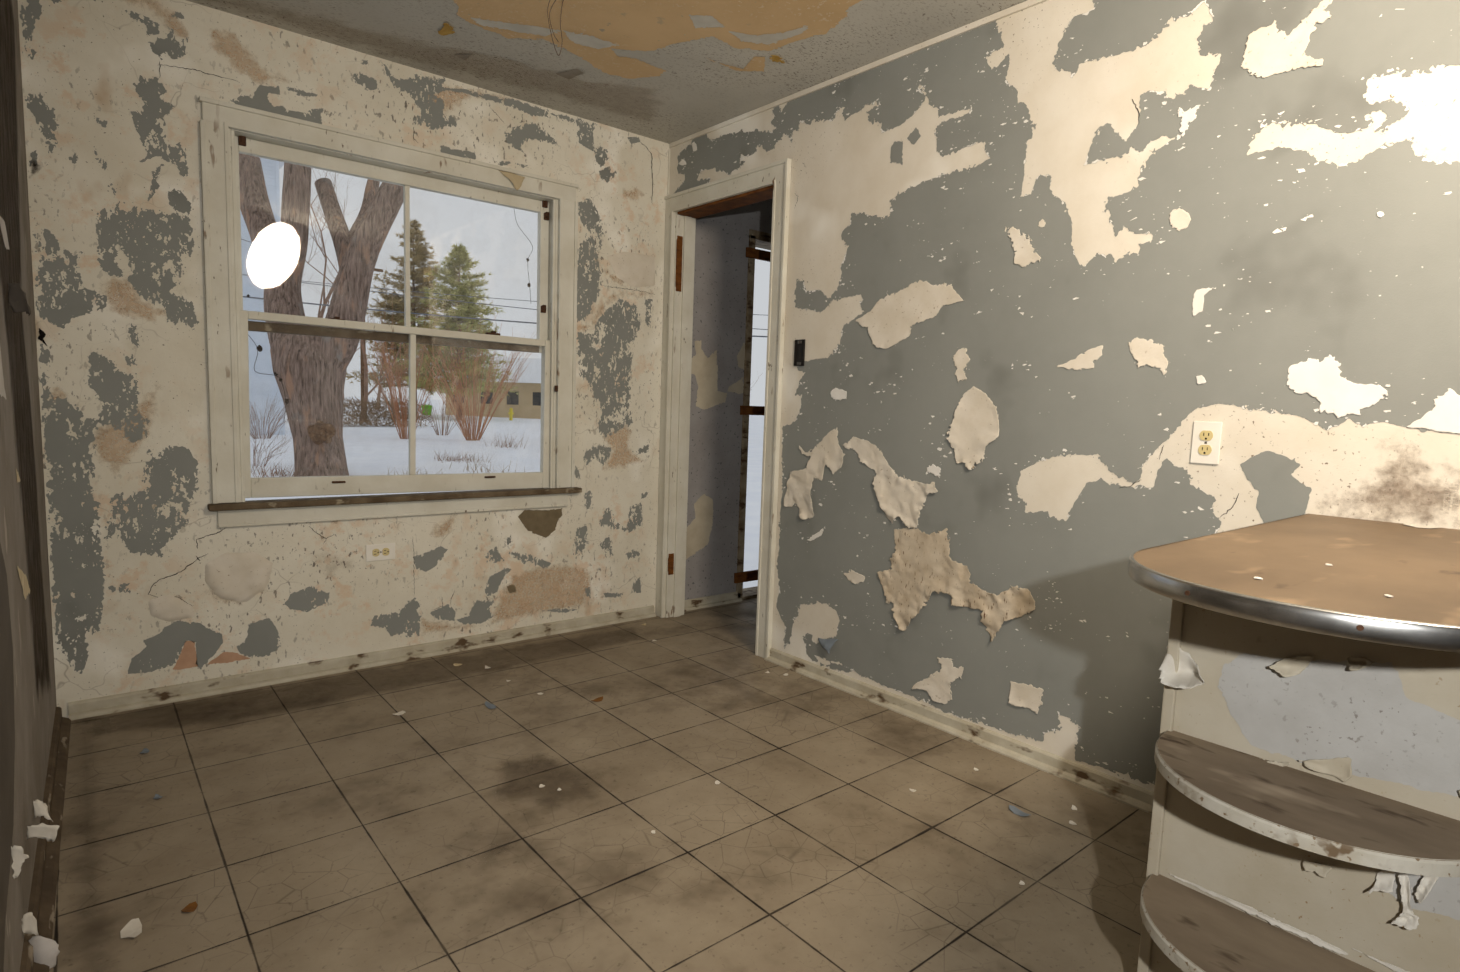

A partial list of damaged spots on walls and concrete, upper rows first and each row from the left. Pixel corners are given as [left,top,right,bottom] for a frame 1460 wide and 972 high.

peeling [438,0,862,79]
peeling [231,85,323,124]
peeling [353,60,616,191]
peeling [8,75,199,674]
peeling [573,199,653,560]
peeling [673,0,1460,797]
leakage [1367,468,1446,519]
peeling [370,508,562,637]
peeling [128,618,281,674]
peeling [0,544,60,972]
peeling [1169,873,1410,972]
peeling [1368,869,1460,930]